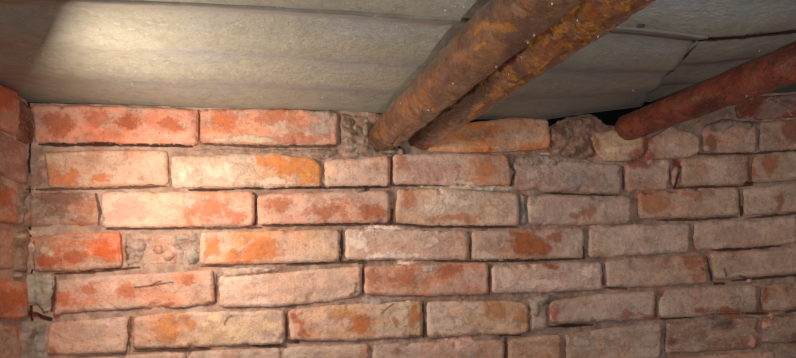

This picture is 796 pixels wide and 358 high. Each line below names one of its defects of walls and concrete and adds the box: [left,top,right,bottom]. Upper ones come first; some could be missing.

crack [668,30,796,74]